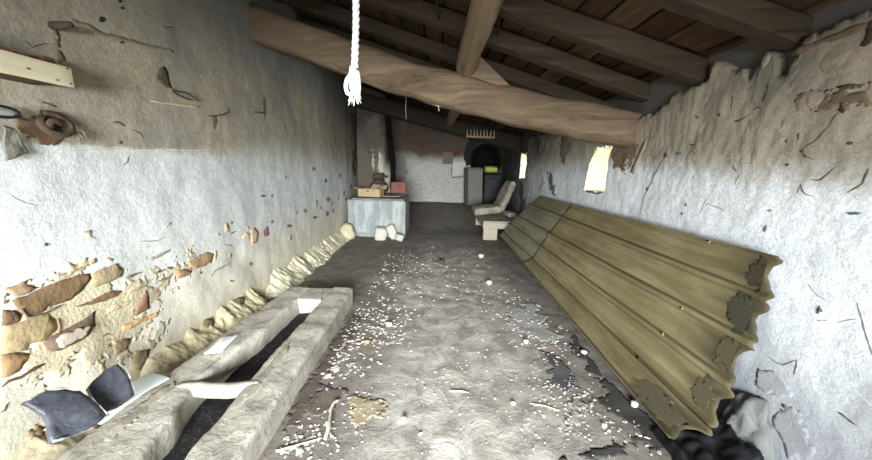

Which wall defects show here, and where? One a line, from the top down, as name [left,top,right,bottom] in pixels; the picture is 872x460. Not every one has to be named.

flaking render [611,129,639,175]
crack [797,111,840,196]
crack [640,158,665,215]
flaking render [243,220,274,245]
flaking render [0,245,232,392]
crack [769,357,797,375]